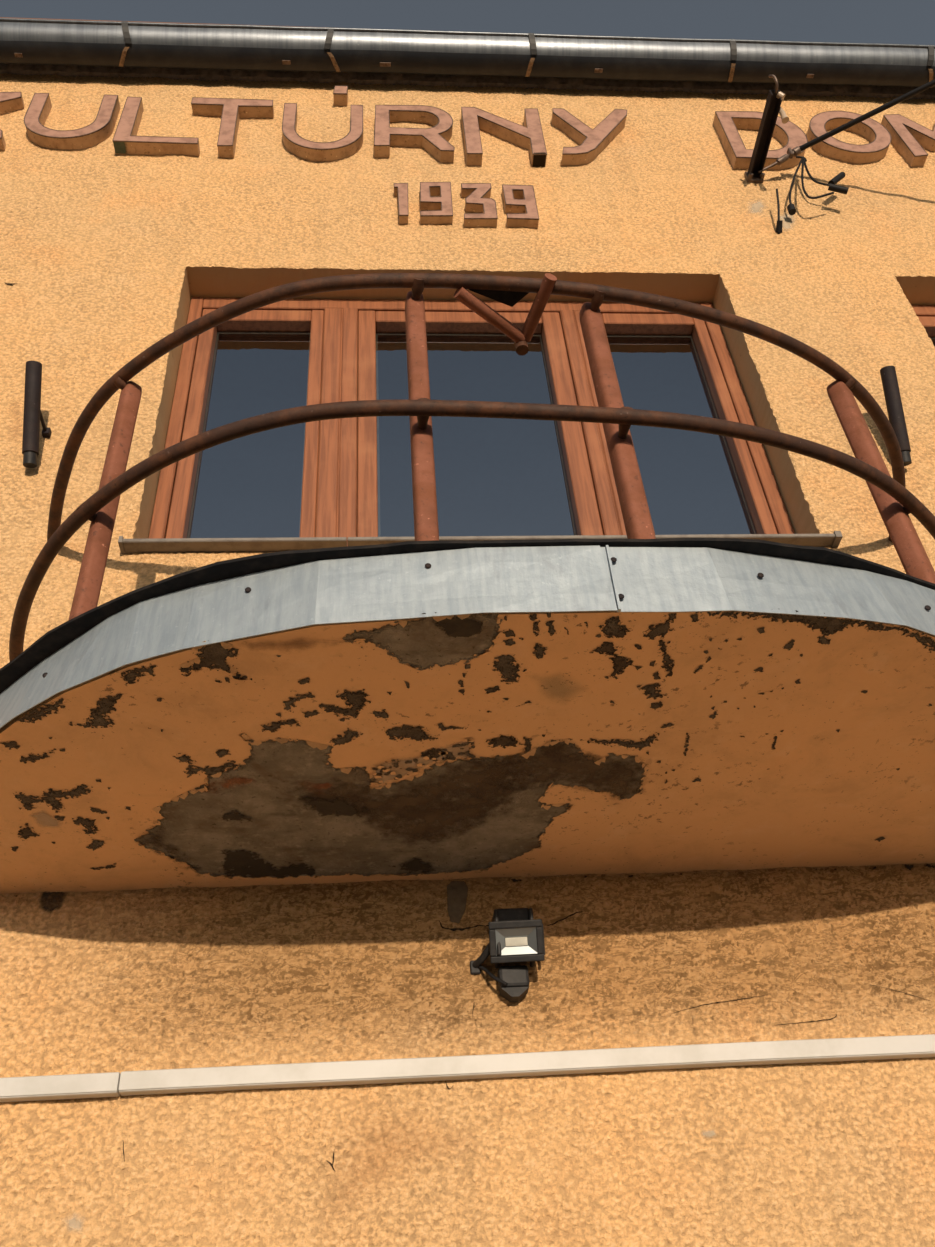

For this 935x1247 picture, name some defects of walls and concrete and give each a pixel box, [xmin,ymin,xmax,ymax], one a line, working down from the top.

peeling [15,698,65,724]
peeling [69,665,156,728]
peeling [179,641,252,683]
spalling [342,612,569,707]
peeling [584,610,935,710]
peeling [0,737,65,763]
spalling [134,678,690,879]
peeling [12,779,110,852]